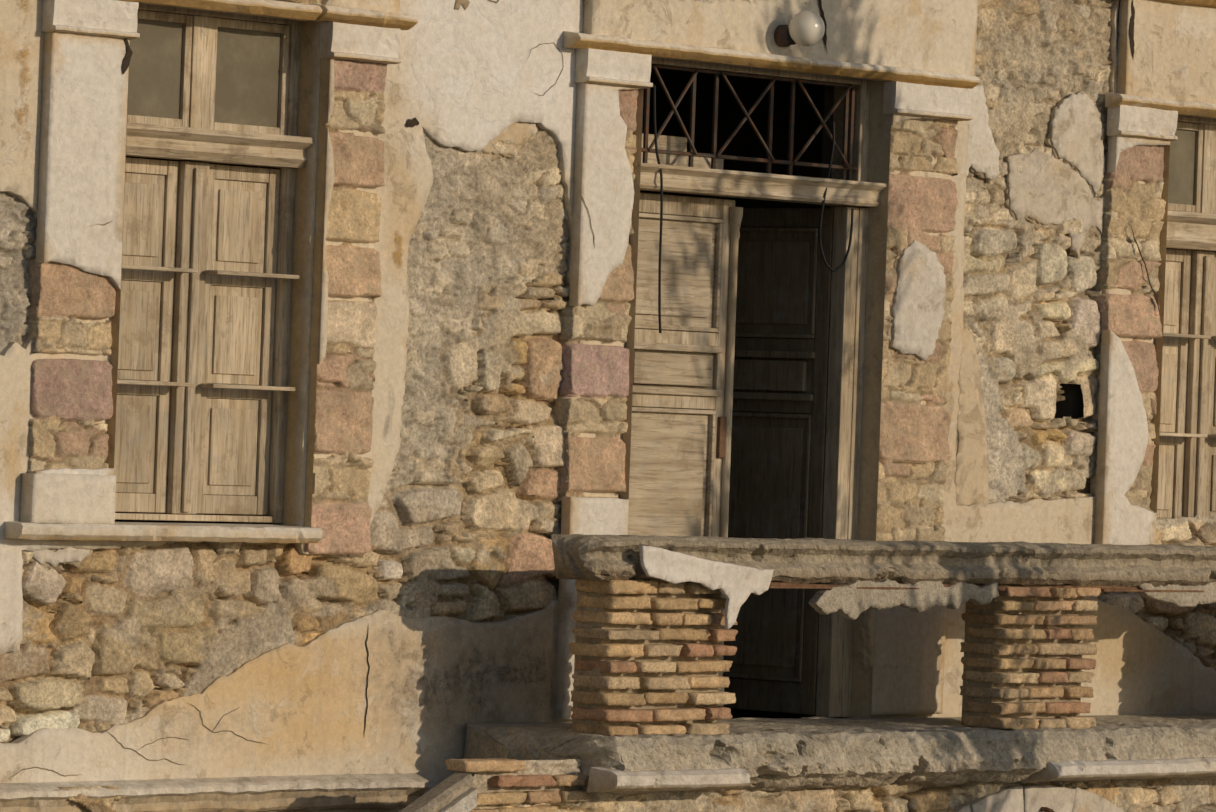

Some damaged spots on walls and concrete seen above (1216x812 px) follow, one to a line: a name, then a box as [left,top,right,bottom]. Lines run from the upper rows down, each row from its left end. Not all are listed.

crack [818,0,827,50]
spalling [618,89,639,181]
spalling [876,0,1216,546]
spalling [0,59,634,743]
peeling [640,545,774,630]
crack [363,624,371,734]
spalling [859,608,875,670]
spalling [1096,591,1216,671]
crack [107,702,265,765]